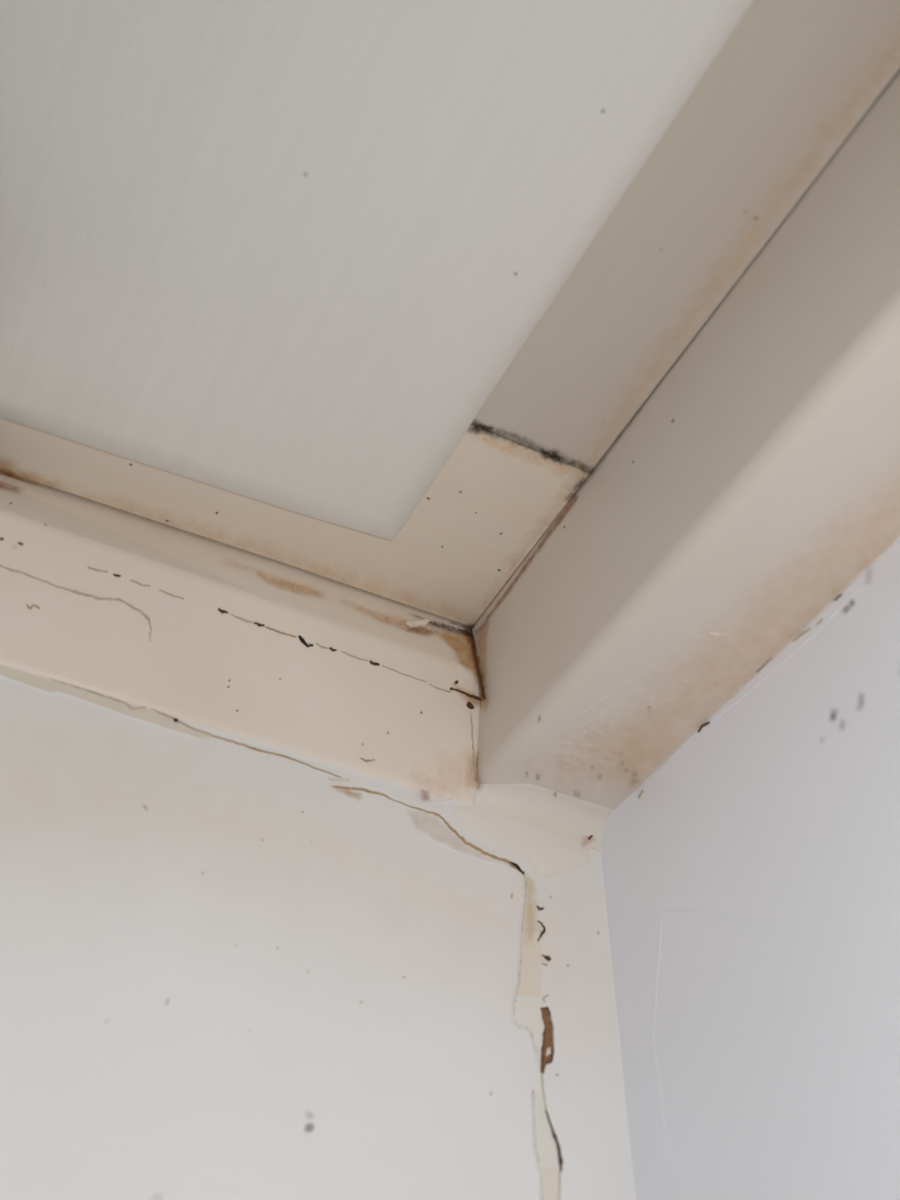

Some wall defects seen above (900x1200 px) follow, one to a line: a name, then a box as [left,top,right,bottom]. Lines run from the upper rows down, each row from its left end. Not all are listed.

crack [0,565,184,641]
leakage [416,616,473,636]
crack [218,608,479,782]
crack [213,735,525,875]
peeling [511,873,556,1073]
peeling [531,1090,560,1200]
crack [541,1073,563,1200]